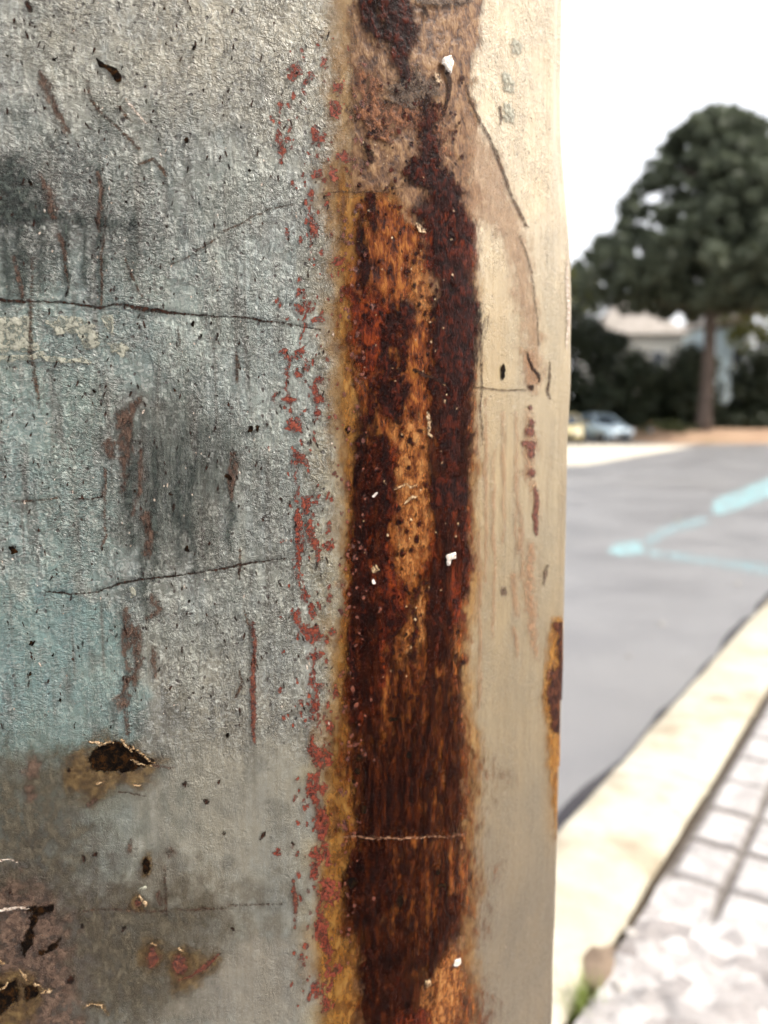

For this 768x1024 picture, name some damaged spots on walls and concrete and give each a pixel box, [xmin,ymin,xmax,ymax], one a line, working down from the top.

crack [0,217,321,344]
peeling [279,301,325,434]
water stain [103,438,116,459]
crack [45,549,287,595]
water stain [226,463,236,552]
rust [318,0,490,1024]
rust [522,405,539,536]
peeling [291,446,343,1015]
rust [542,617,563,839]
spalling [0,979,39,1015]
spalling [20,904,62,958]
rust [139,942,220,990]